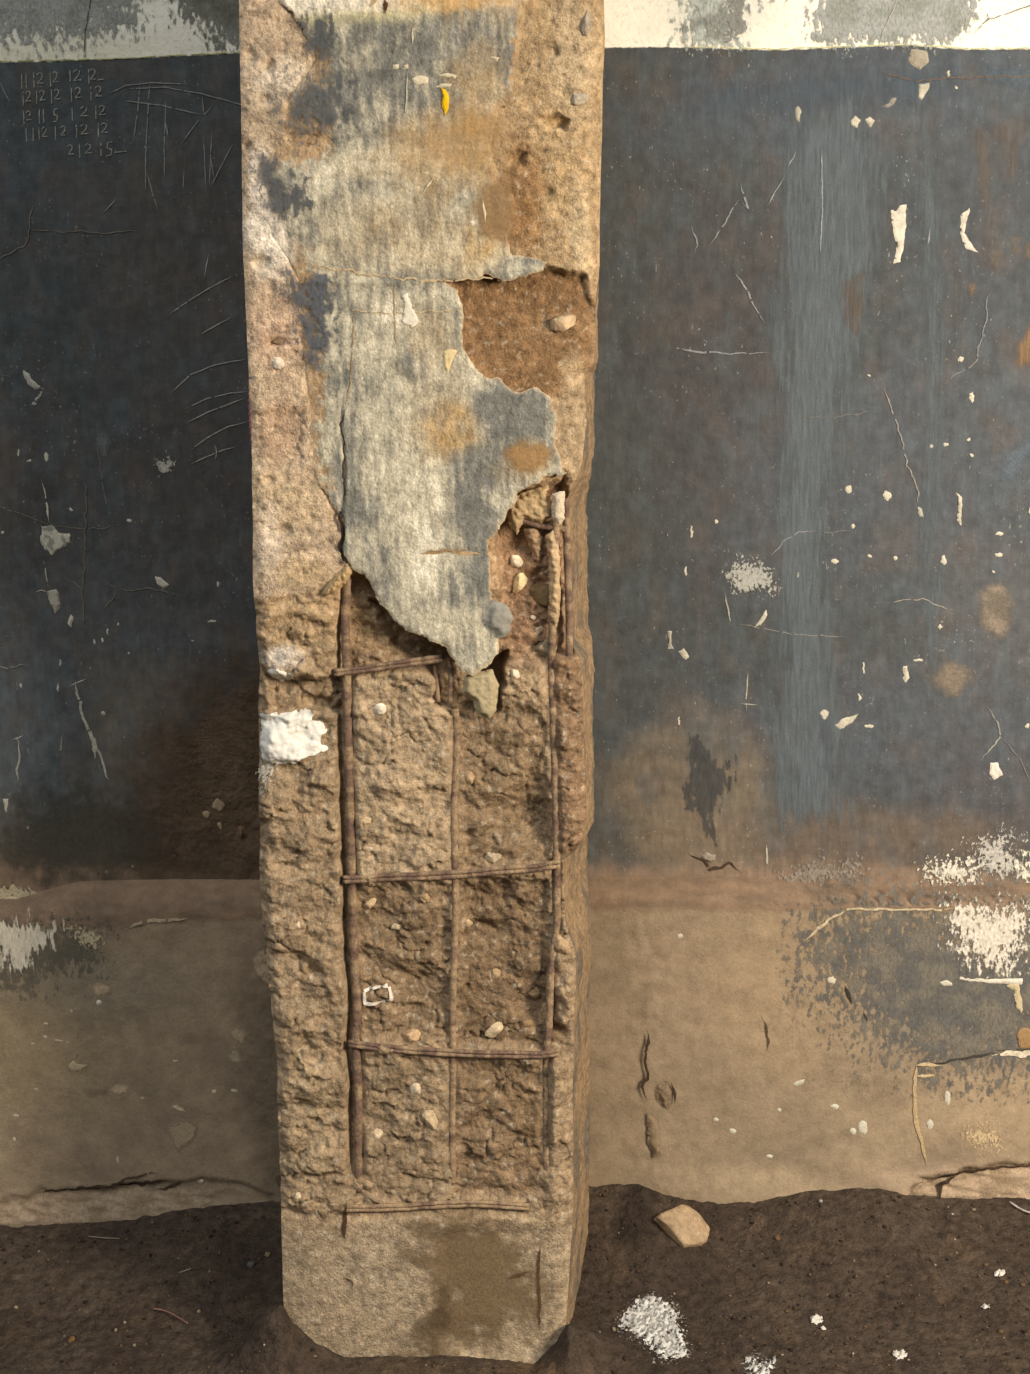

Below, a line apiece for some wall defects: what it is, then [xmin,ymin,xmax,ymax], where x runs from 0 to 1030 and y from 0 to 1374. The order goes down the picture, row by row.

peeling [801,0,995,101]
crack [880,0,1030,82]
crack [0,205,133,259]
peeling [891,204,907,264]
peeling [960,208,977,252]
spalling [0,0,605,1226]
peeling [990,762,1003,780]
damp [914,822,1030,886]
peeling [776,861,1030,1105]
crack [44,1172,182,1192]
flaking render [909,1163,1030,1200]
damp [407,1213,552,1356]